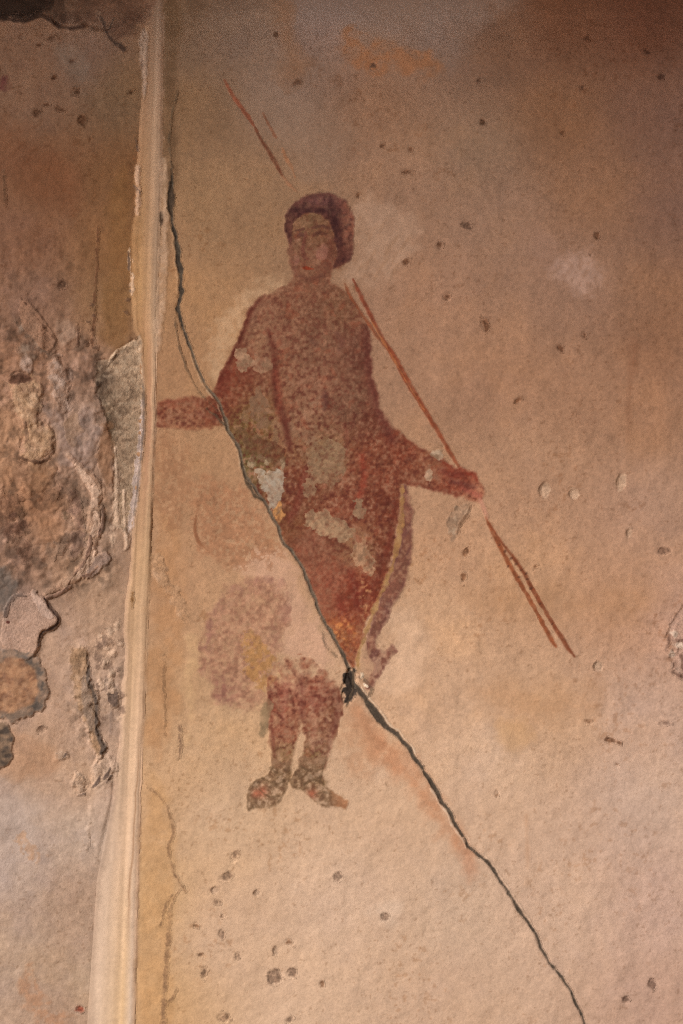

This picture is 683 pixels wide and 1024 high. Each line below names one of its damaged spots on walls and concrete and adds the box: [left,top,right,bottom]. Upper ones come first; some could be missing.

flaking render [0,297,147,660]
flaking render [68,617,128,796]
crack [158,90,587,1024]
crack [146,784,188,1024]